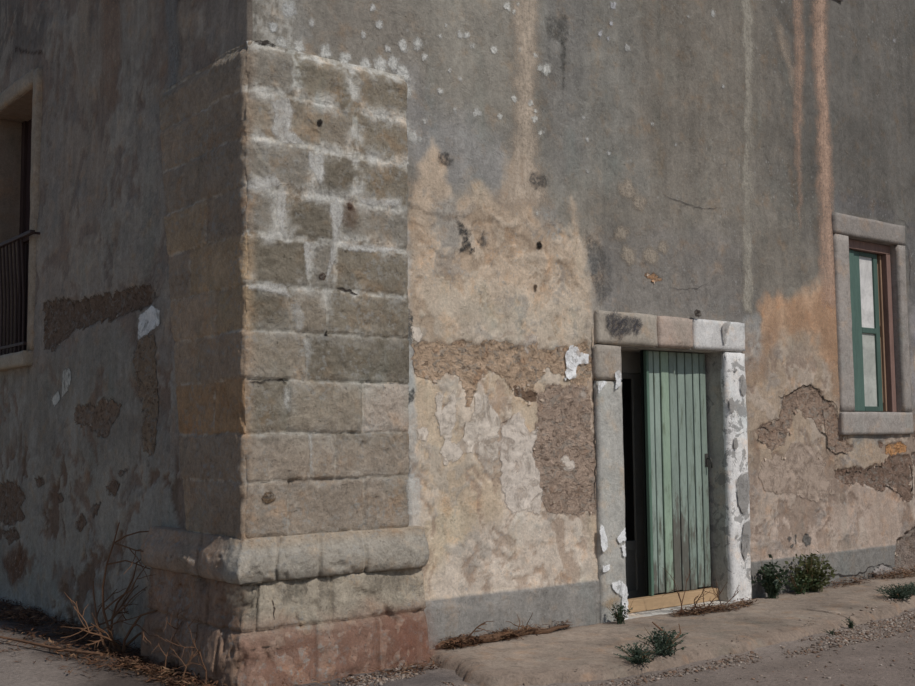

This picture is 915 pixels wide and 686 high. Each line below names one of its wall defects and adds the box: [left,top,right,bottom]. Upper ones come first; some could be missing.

leakage [499,0,545,207]
rust [813,0,836,305]
spalling [42,284,160,352]
leakage [607,311,643,340]
peeling [52,368,71,407]
spalling [74,398,122,438]
spalling [411,326,622,517]
peeling [736,384,915,560]
spalling [0,480,26,545]
peeling [600,525,626,556]
spalling [894,526,915,573]
peeling [612,580,629,620]